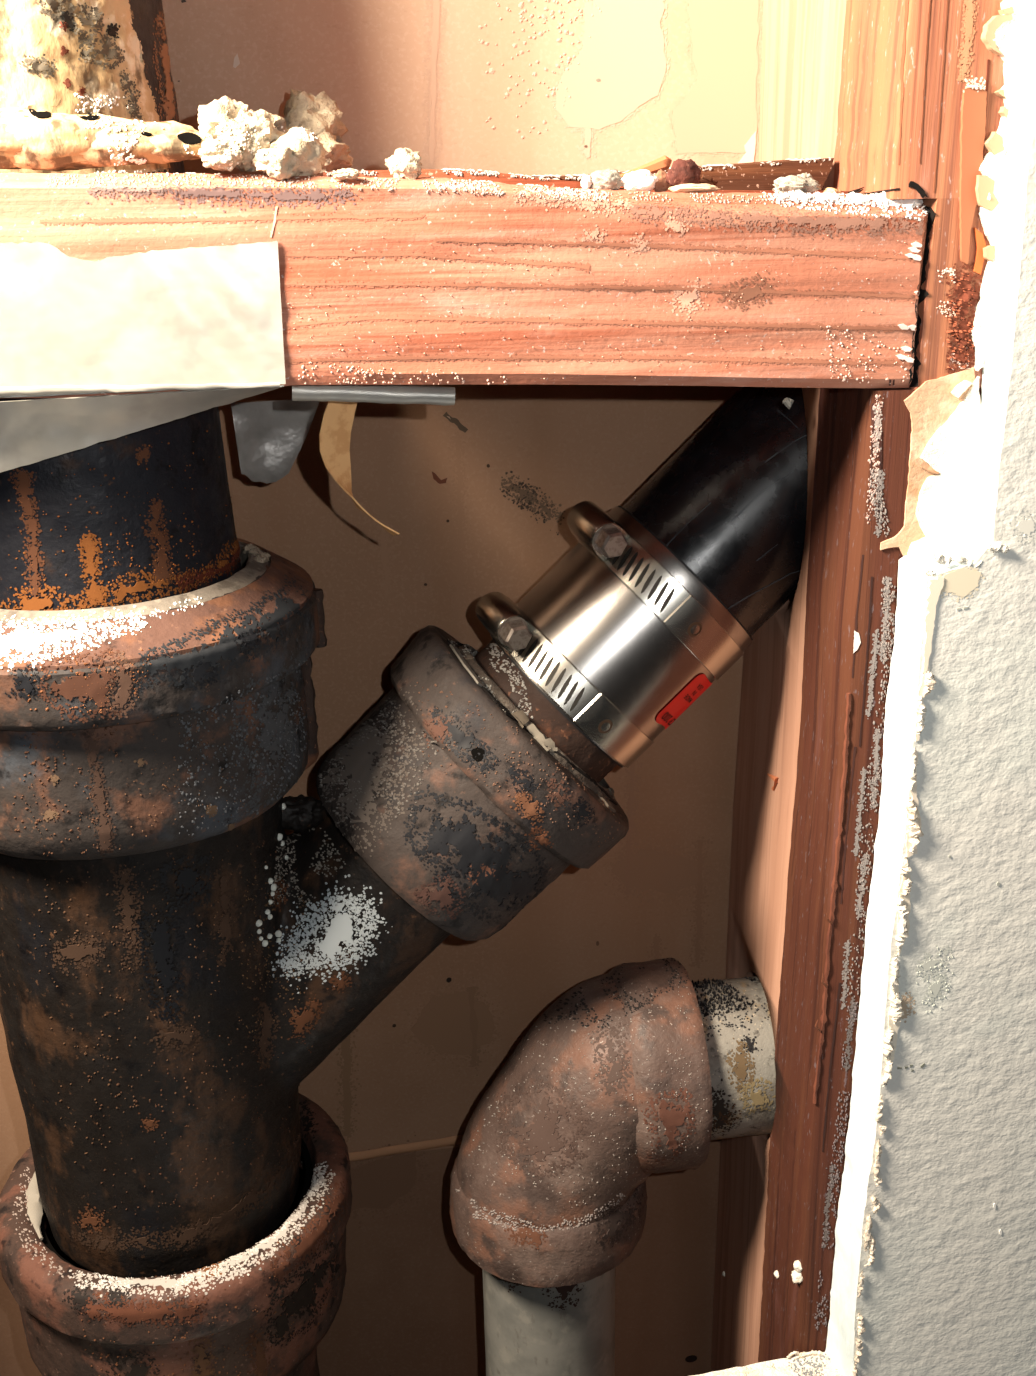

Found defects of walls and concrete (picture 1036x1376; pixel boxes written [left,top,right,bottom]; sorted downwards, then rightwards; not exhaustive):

peeling [905,242,922,261]
peeling [895,324,916,363]
peeling [853,630,861,653]
peeling [897,576,944,955]
peeling [886,978,902,1063]